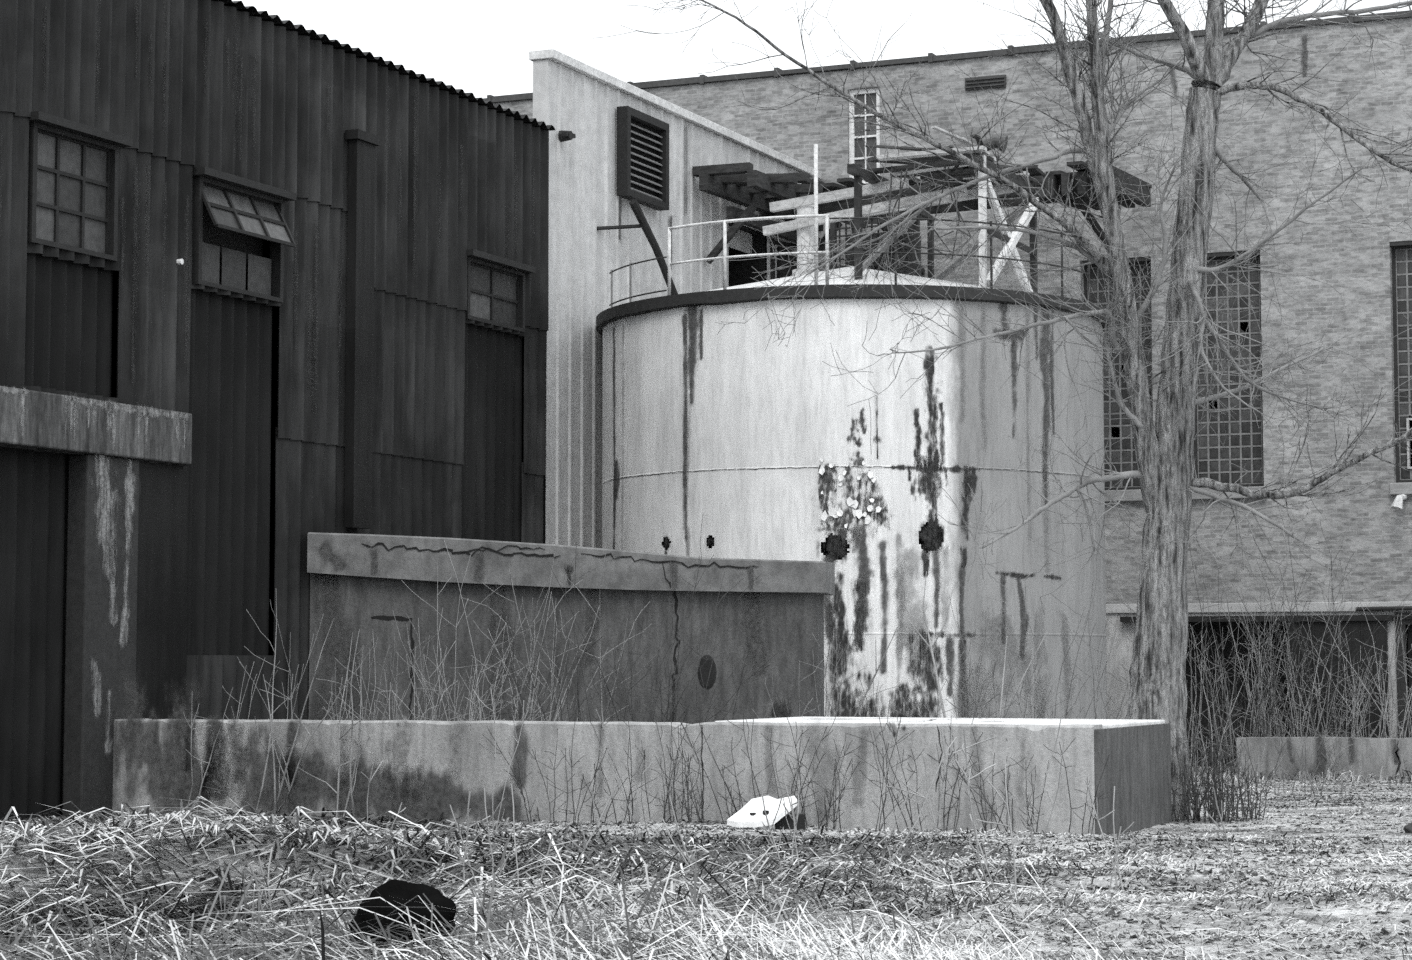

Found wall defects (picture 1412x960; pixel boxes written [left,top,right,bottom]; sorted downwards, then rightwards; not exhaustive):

crack [361,542,754,805]
corrosion [829,346,977,718]